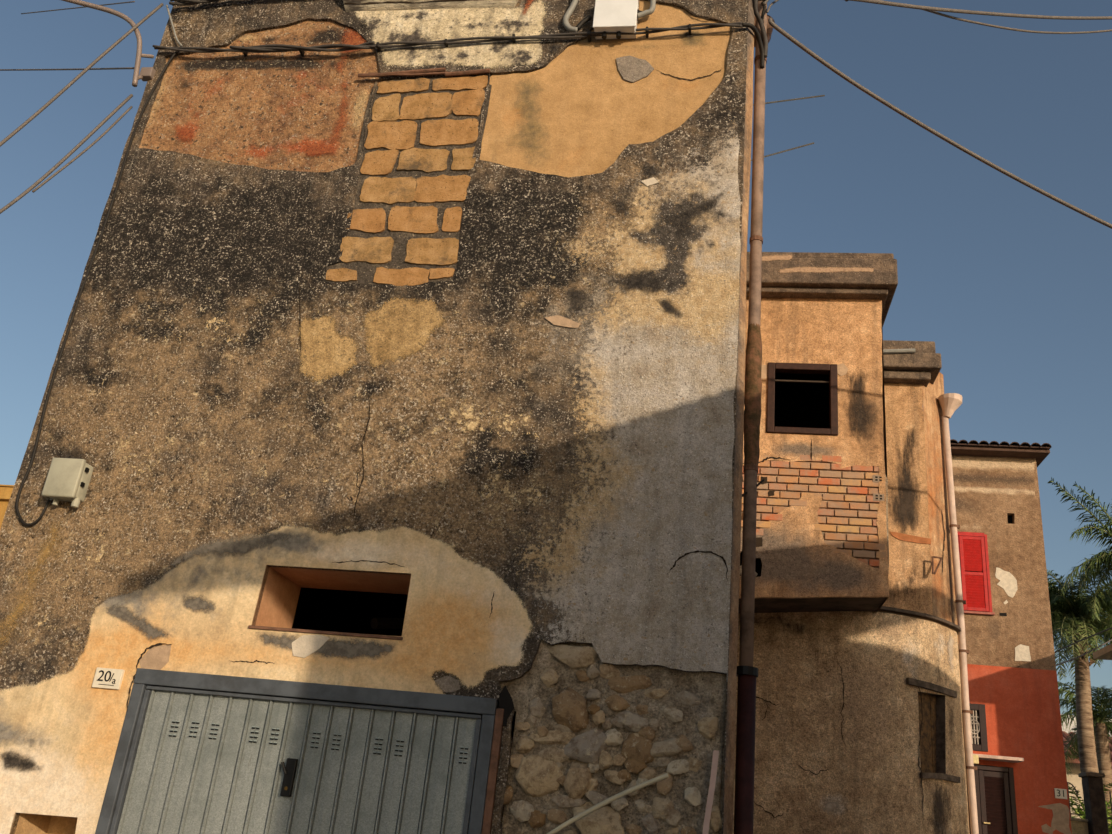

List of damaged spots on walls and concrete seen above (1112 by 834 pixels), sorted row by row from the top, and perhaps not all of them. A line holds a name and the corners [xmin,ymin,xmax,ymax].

crack [657,68,723,81]
damp [669,194,723,239]
damp [567,288,588,308]
damp [625,274,682,317]
damp [849,375,869,438]
crack [353,391,370,518]
damp [888,432,920,531]
flaking render [741,454,931,570]
crack [670,550,728,581]
damp [934,788,950,834]
peeling [1038,803,1072,834]